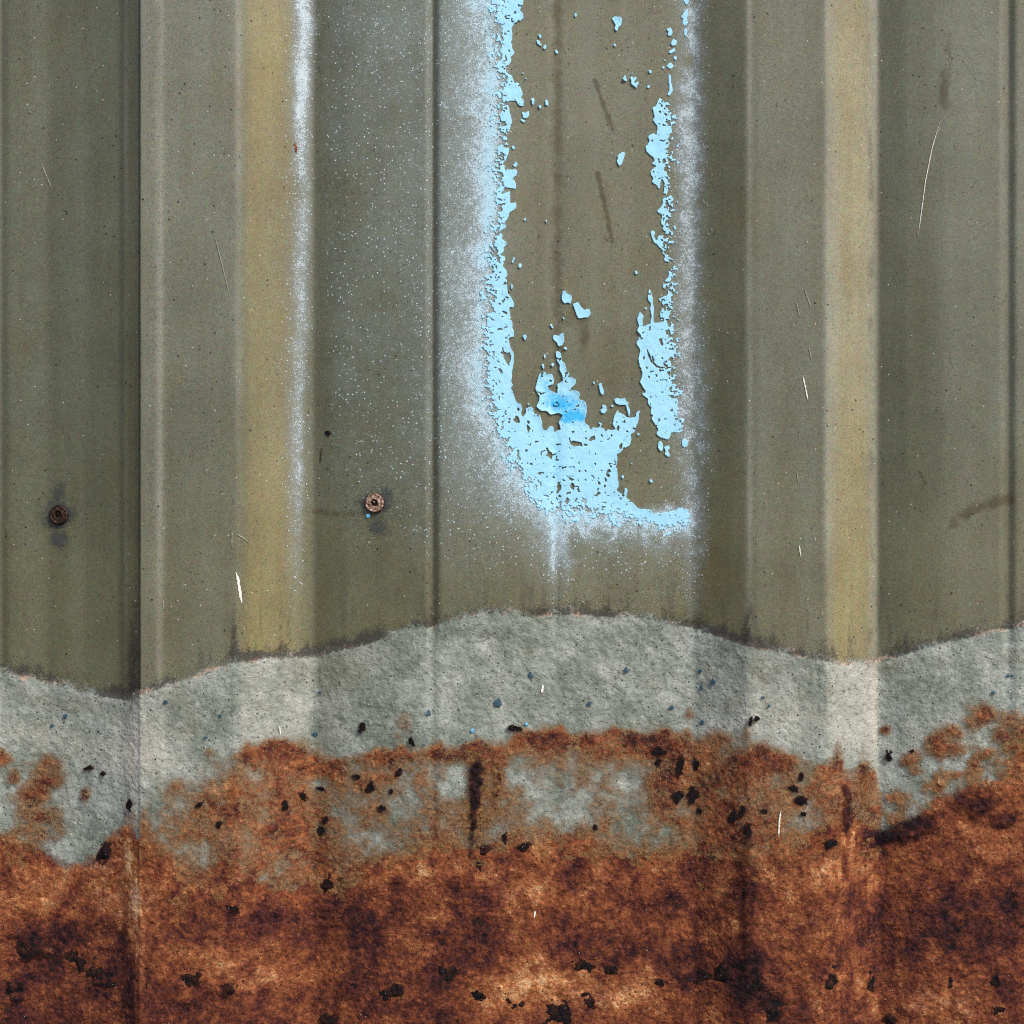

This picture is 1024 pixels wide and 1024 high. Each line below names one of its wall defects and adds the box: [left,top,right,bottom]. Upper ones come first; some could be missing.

peeling [474,0,690,536]
peeling [78,787,90,803]
peeling [351,774,376,793]
peeling [652,746,702,816]
peeling [787,772,808,816]
peeling [728,805,753,837]
rust [0,703,1024,1024]